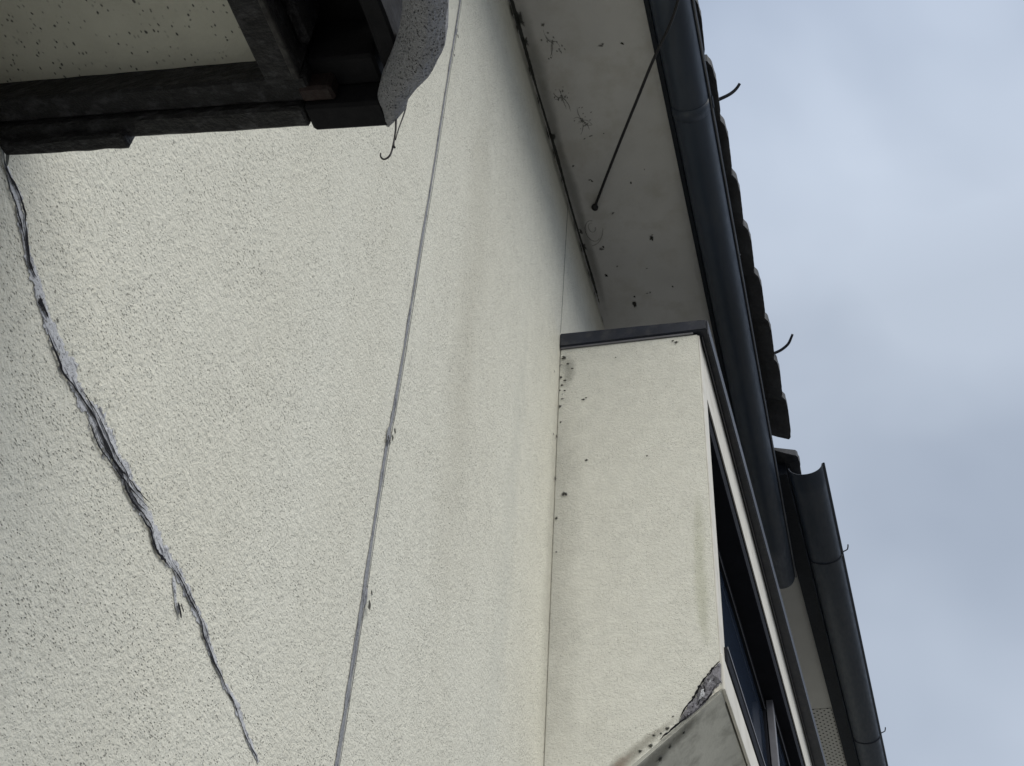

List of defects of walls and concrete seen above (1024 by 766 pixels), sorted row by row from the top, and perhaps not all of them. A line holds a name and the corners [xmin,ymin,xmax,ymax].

crack [3,152,259,763]
spalling [660,661,722,740]